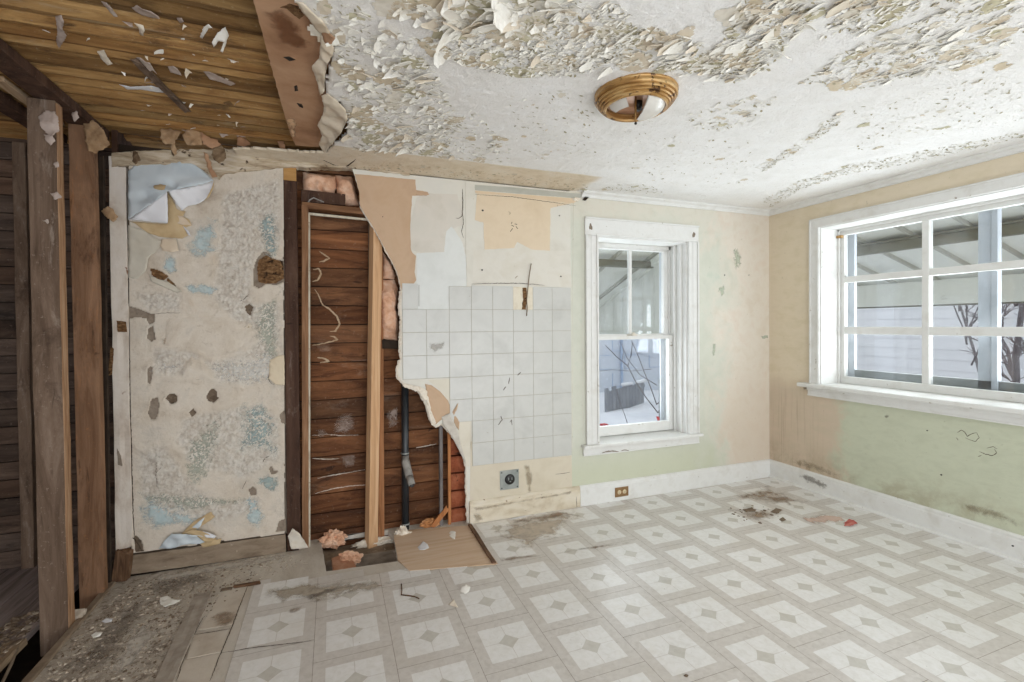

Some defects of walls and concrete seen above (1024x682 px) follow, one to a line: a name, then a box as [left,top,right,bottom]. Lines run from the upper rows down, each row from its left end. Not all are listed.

peeling [44,15,67,47]
peeling [101,1,160,36]
peeling [200,24,237,63]
peeling [97,49,235,93]
peeling [295,0,1024,207]
peeling [160,101,250,178]
peeling [128,225,181,293]
spalling [253,252,284,288]
spalling [129,306,156,342]
peeling [269,355,285,385]